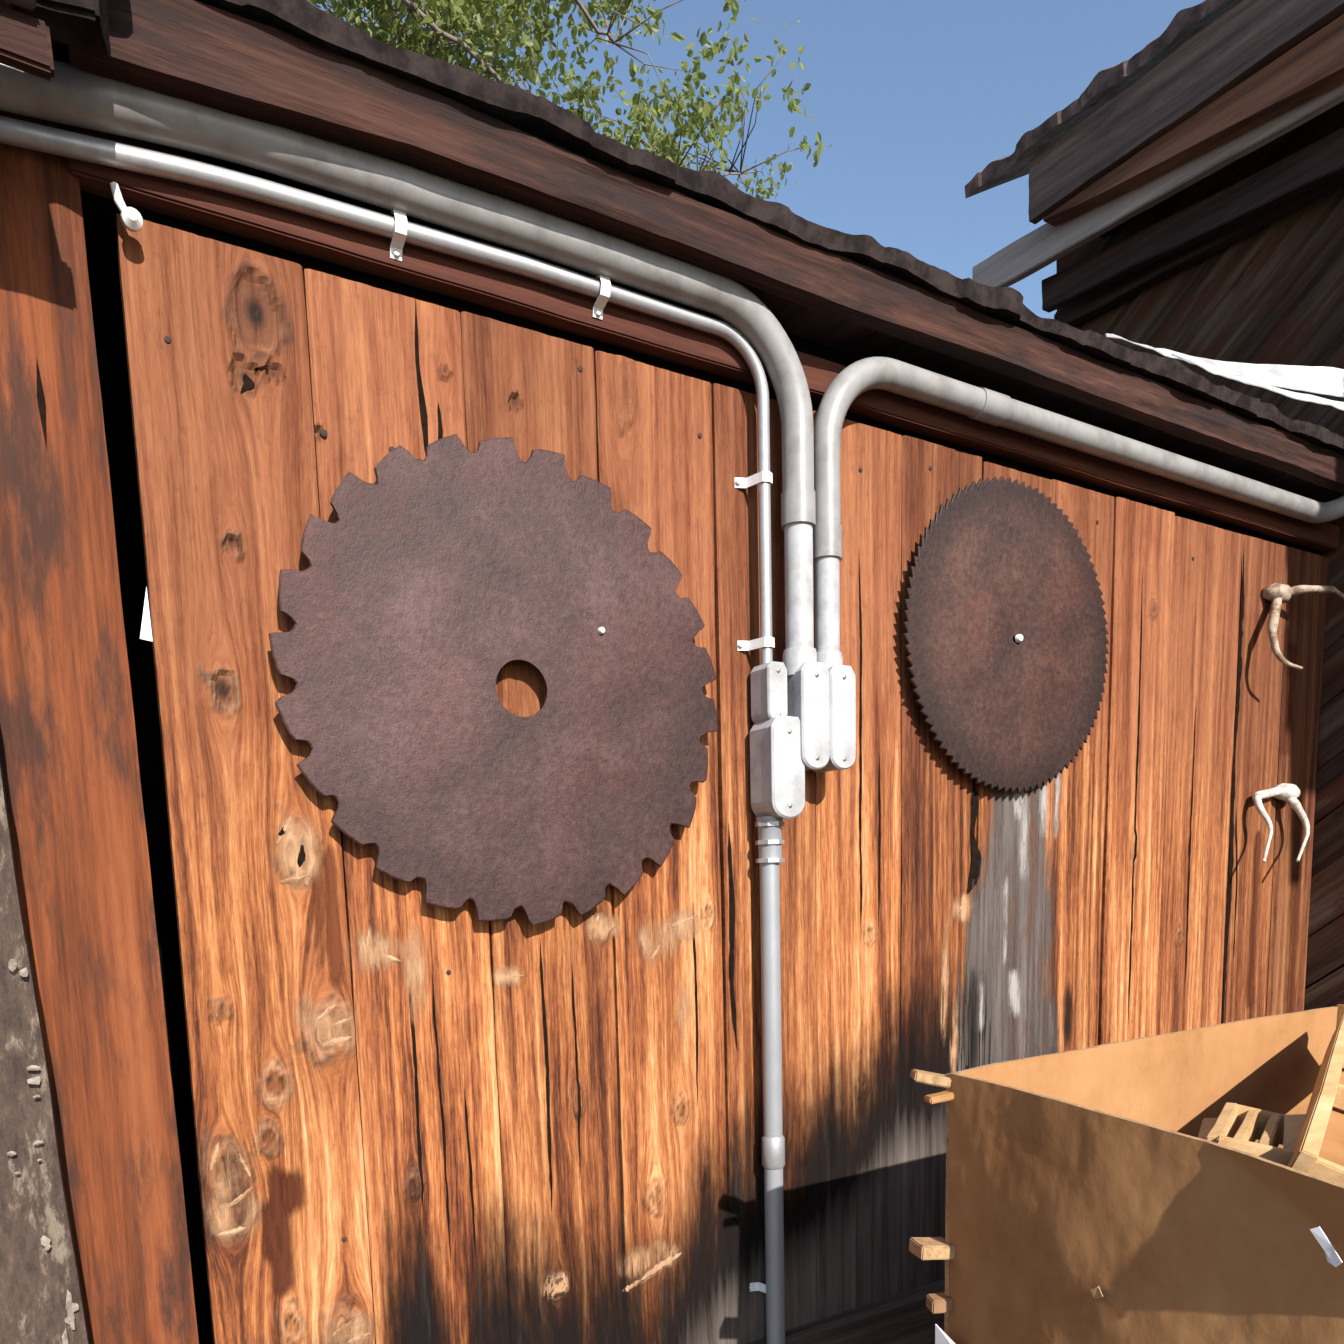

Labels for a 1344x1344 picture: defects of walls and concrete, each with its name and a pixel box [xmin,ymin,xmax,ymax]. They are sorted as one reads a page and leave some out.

crack [415,302,443,454]
crack [966,778,982,895]
crack [691,907,699,1102]
crack [728,831,737,1047]
water stain [783,774,1072,1331]
water stain [386,1229,452,1344]
water stain [469,1108,766,1344]